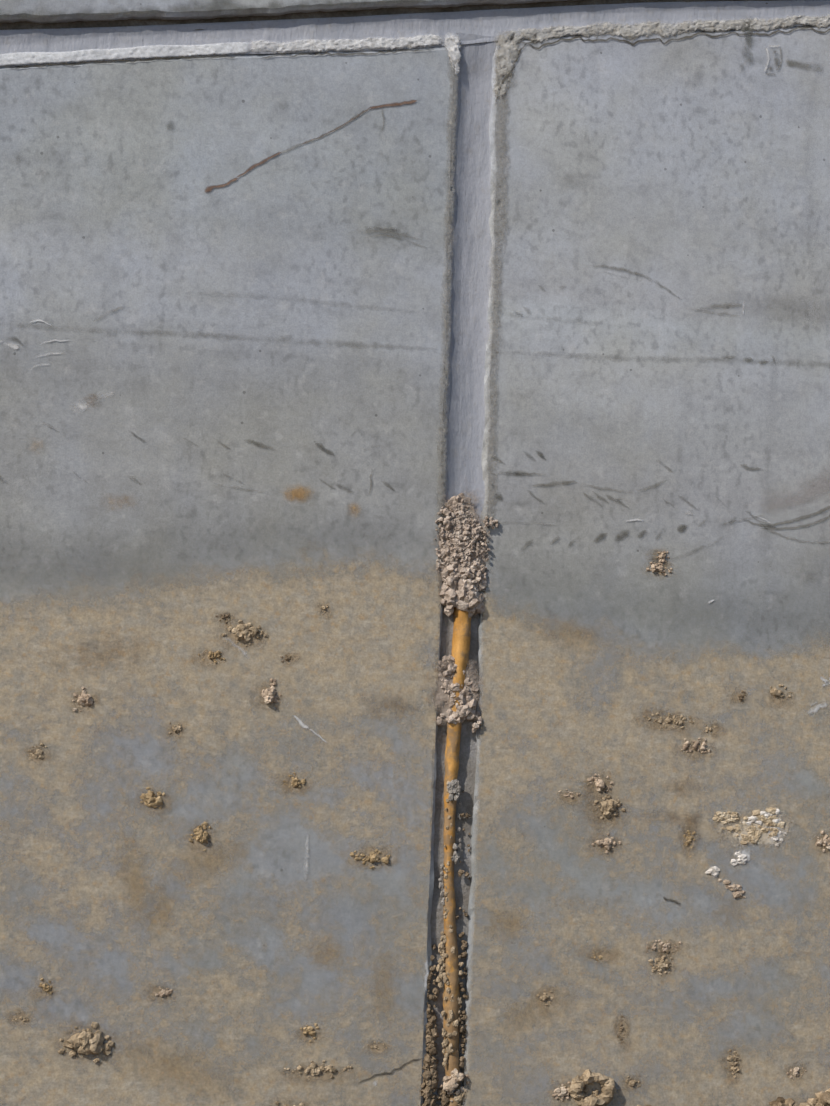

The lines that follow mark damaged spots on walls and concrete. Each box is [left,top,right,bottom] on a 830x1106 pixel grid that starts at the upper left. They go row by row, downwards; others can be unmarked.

corrosion [205,100,416,192]
crack [359,1058,423,1083]